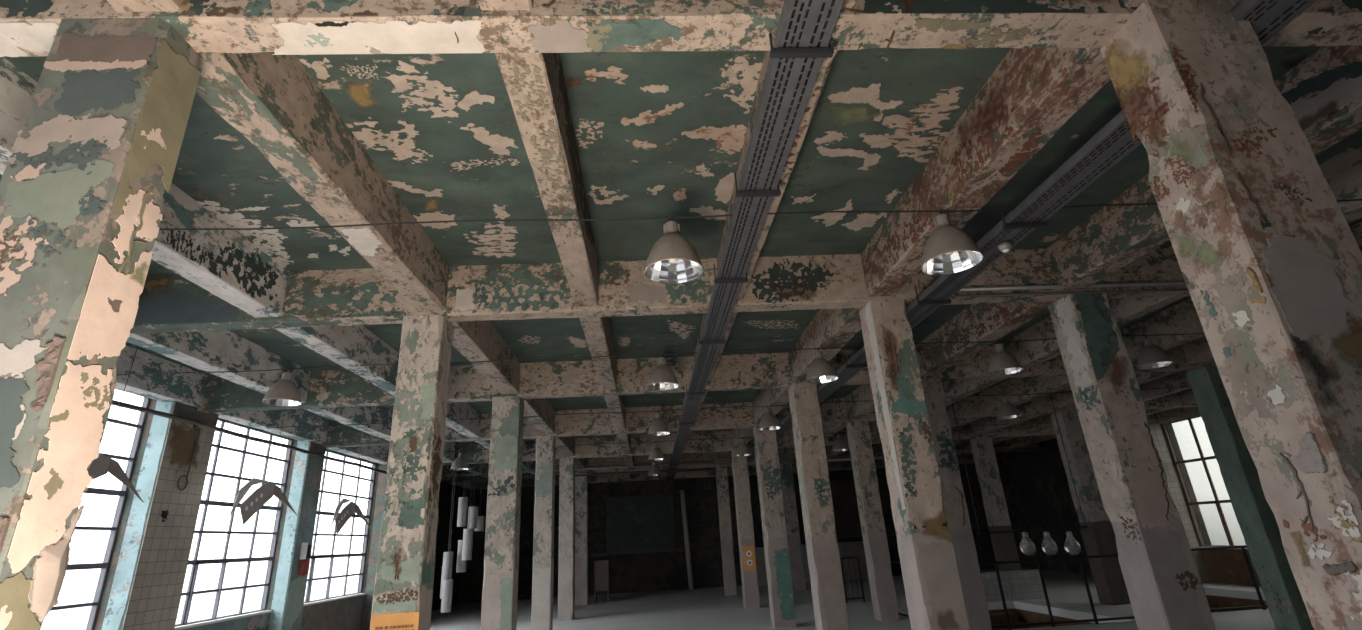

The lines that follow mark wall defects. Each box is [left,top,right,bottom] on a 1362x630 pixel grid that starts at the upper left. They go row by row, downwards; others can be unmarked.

peeling [8,113,166,182]
peeling [44,59,147,72]
peeling [299,40,629,205]
peeling [584,66,684,149]
peeling [681,56,762,155]
peeling [788,66,964,170]
peeling [0,216,77,296]
peeling [387,180,519,274]
peeling [647,164,735,221]
peeling [792,189,902,231]
peeling [0,605,12,630]
spalling [1174,571,1268,613]